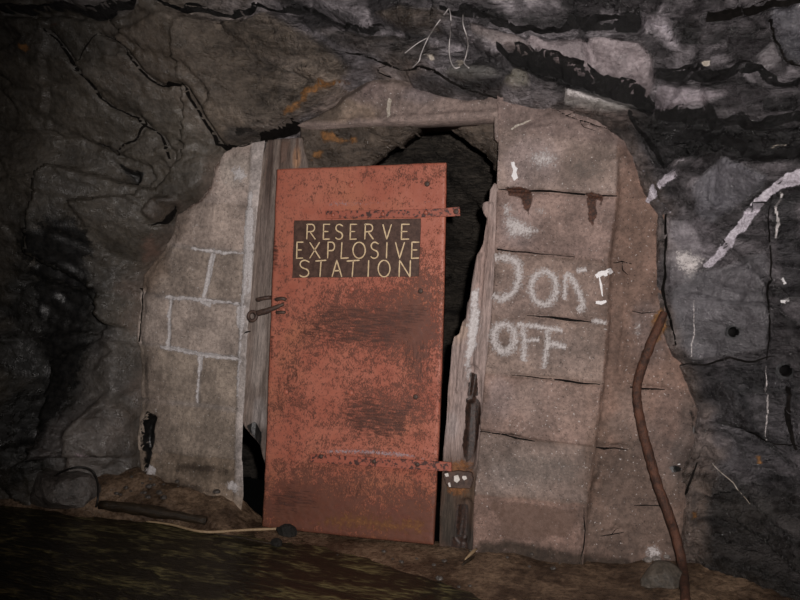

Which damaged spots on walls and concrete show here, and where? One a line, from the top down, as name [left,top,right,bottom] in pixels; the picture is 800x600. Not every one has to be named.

crack [529,189,617,197]
corrosion [505,187,532,211]
corrosion [586,192,604,225]
crack [497,249,574,257]
crack [527,315,592,323]
crack [512,375,600,385]
crack [480,431,535,442]
spalling [140,411,157,480]